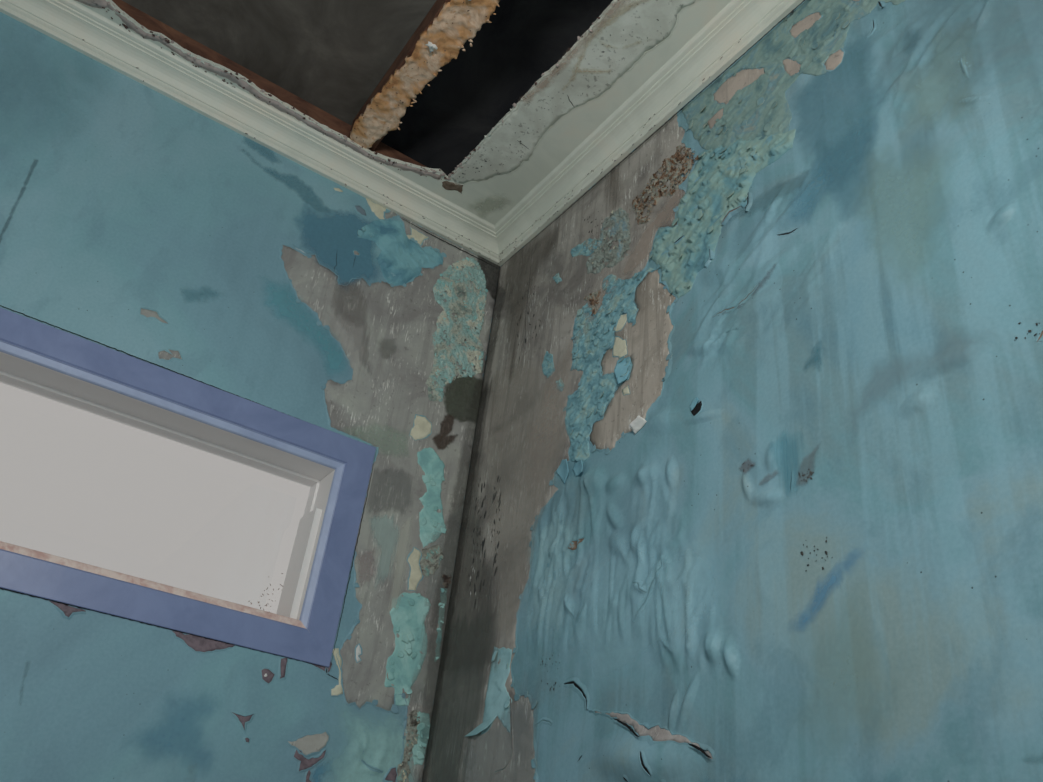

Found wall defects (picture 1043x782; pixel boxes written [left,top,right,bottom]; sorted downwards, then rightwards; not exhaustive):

peeling [789,11,823,39]
peeling [73,0,701,194]
peeling [707,67,765,129]
water stain [478,256,500,299]
peeling [279,102,694,782]
peeling [260,658,288,685]